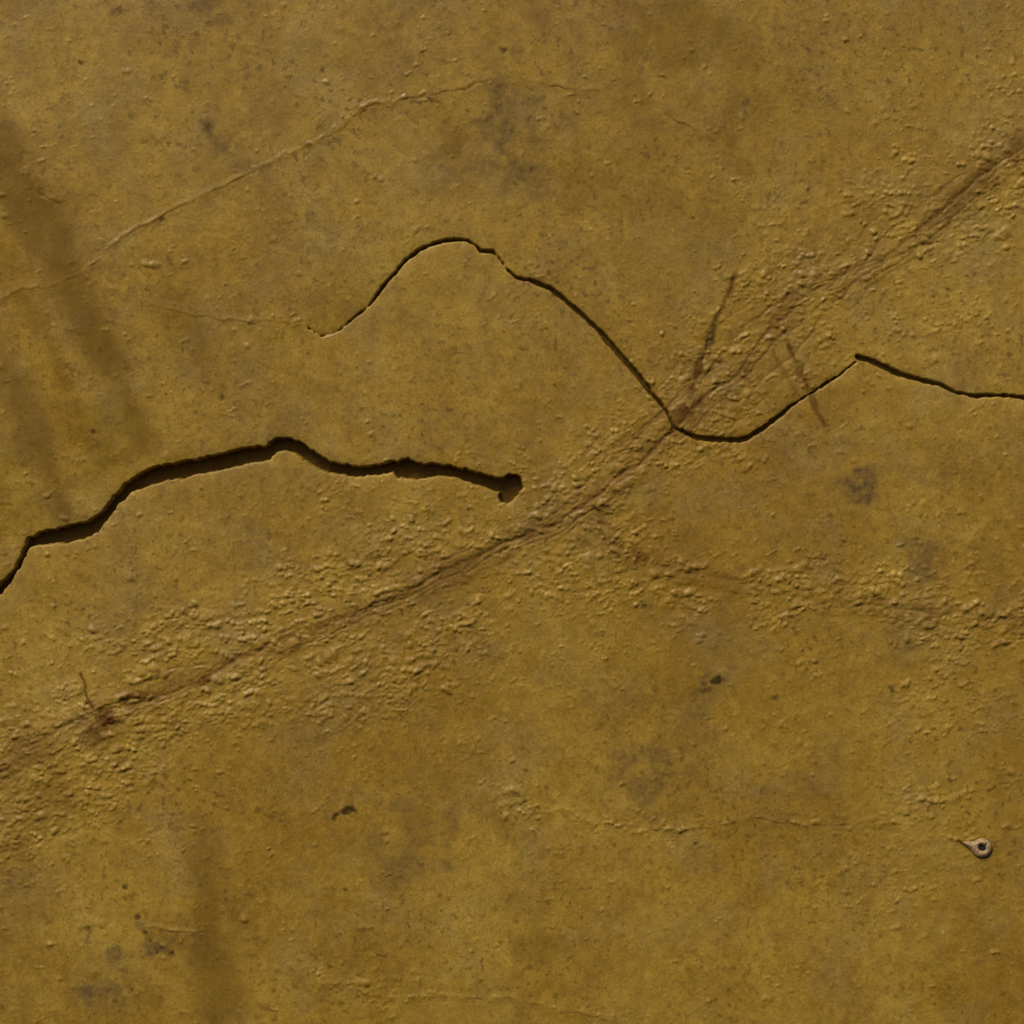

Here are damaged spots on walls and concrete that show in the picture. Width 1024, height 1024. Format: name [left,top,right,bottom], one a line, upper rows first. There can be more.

crack [348,239,1024,443]
crack [0,439,522,595]